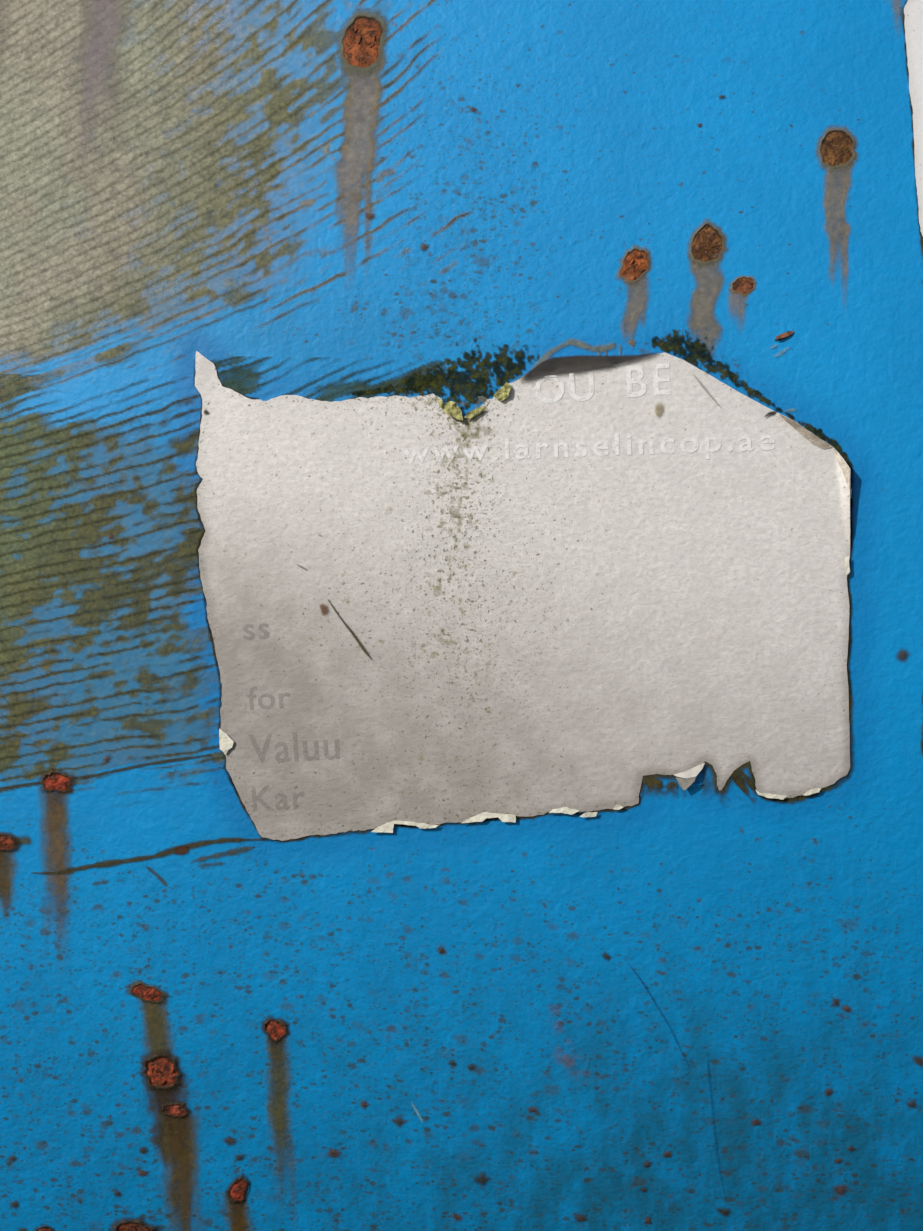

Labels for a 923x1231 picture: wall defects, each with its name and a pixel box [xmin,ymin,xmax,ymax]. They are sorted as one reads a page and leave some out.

rust [337,10,388,238]
rust [817,127,857,275]
rust [618,246,651,335]
rust [688,220,756,348]
rust [0,832,30,909]
rust [40,770,75,911]
rust [127,981,197,1231]
rust [262,1017,289,1166]
rust [111,1218,158,1231]
rust [226,1175,250,1231]